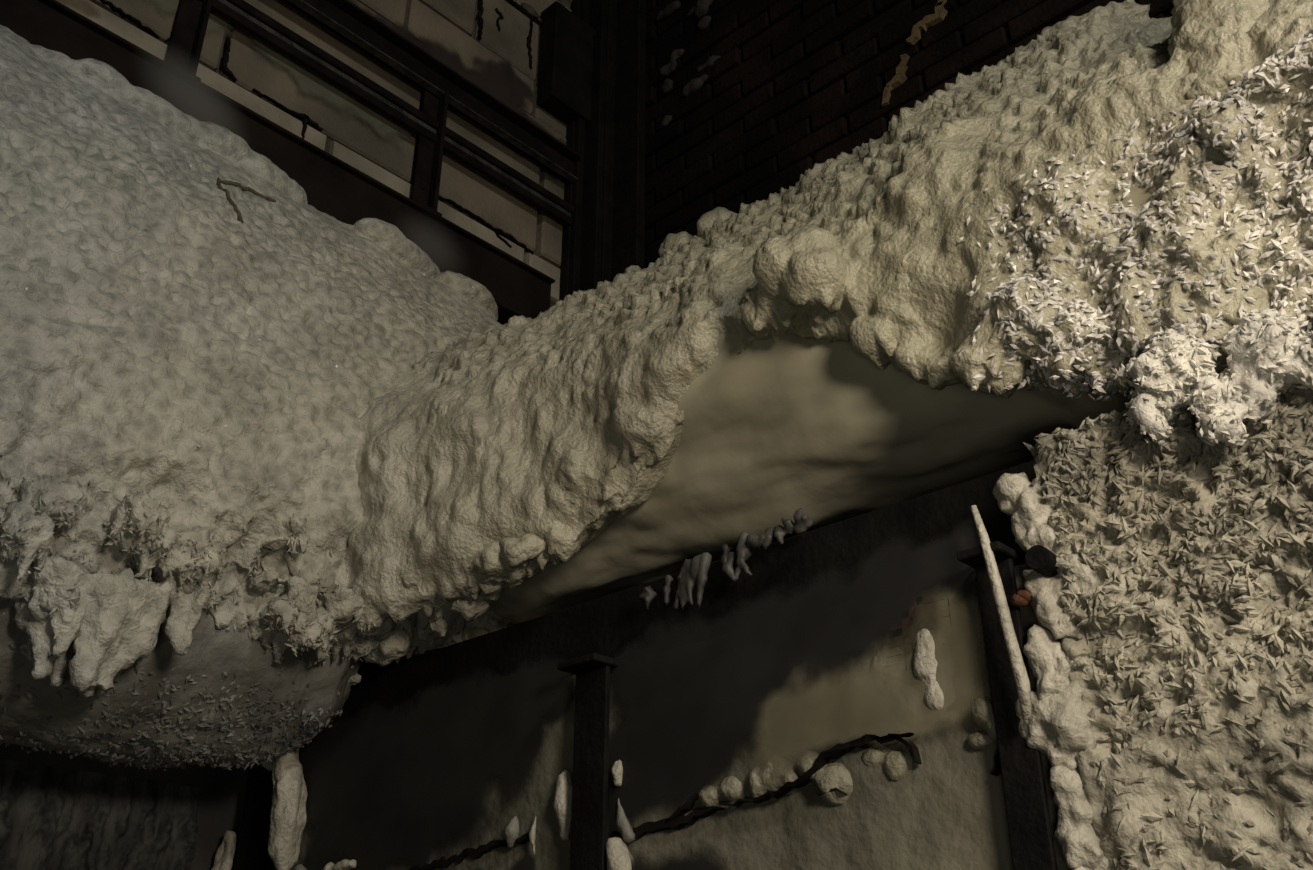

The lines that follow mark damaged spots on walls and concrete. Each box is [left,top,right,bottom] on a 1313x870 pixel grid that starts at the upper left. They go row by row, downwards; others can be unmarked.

crack [477,0,542,70]
crack [881,0,948,107]
crack [613,732,922,840]
crack [409,832,529,870]